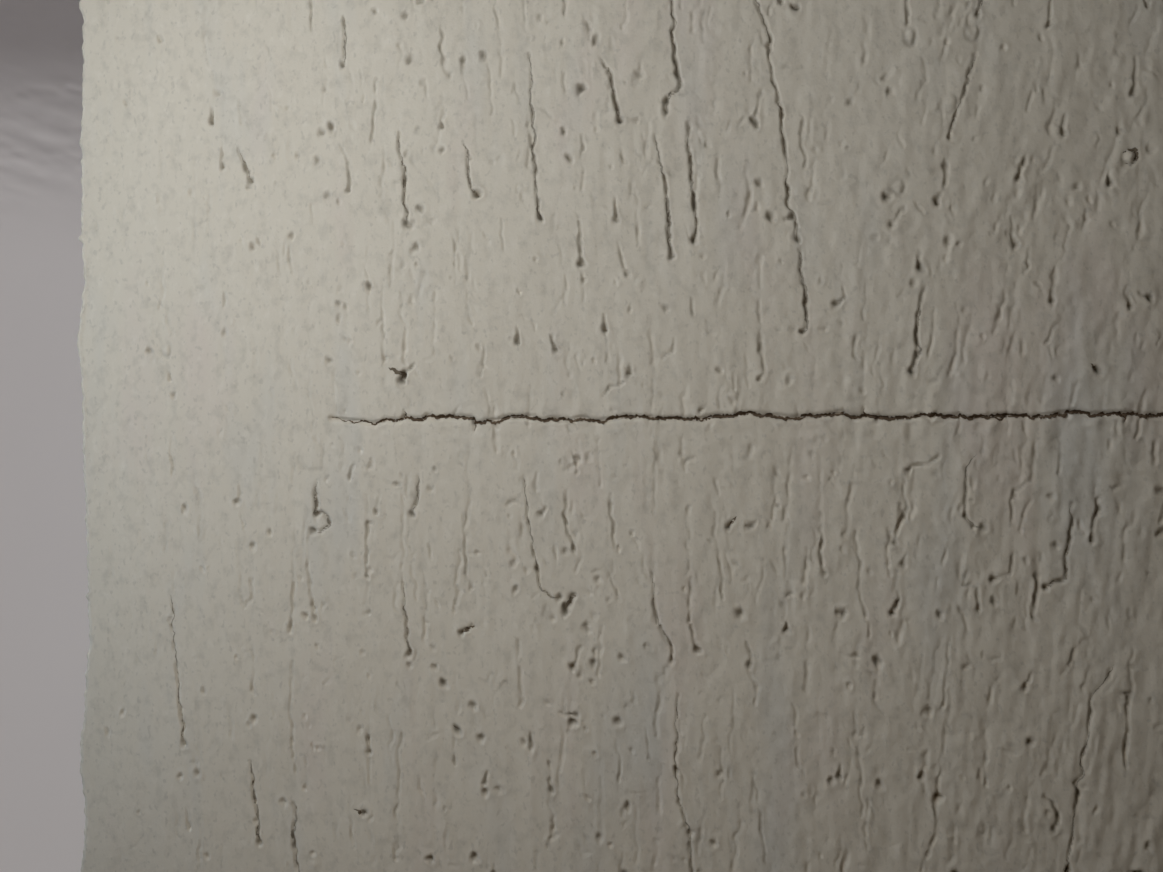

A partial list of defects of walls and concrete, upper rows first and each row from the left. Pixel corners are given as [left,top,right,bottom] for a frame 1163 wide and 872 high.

crack [332,409,1163,431]